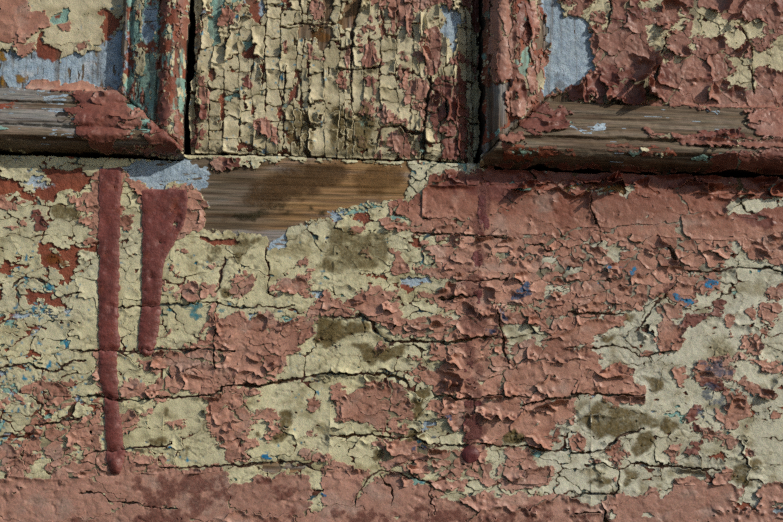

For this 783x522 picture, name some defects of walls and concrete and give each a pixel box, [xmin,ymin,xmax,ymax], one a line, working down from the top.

peeling [0,0,125,63]
peeling [129,38,147,78]
peeling [156,0,190,69]
peeling [21,50,184,159]